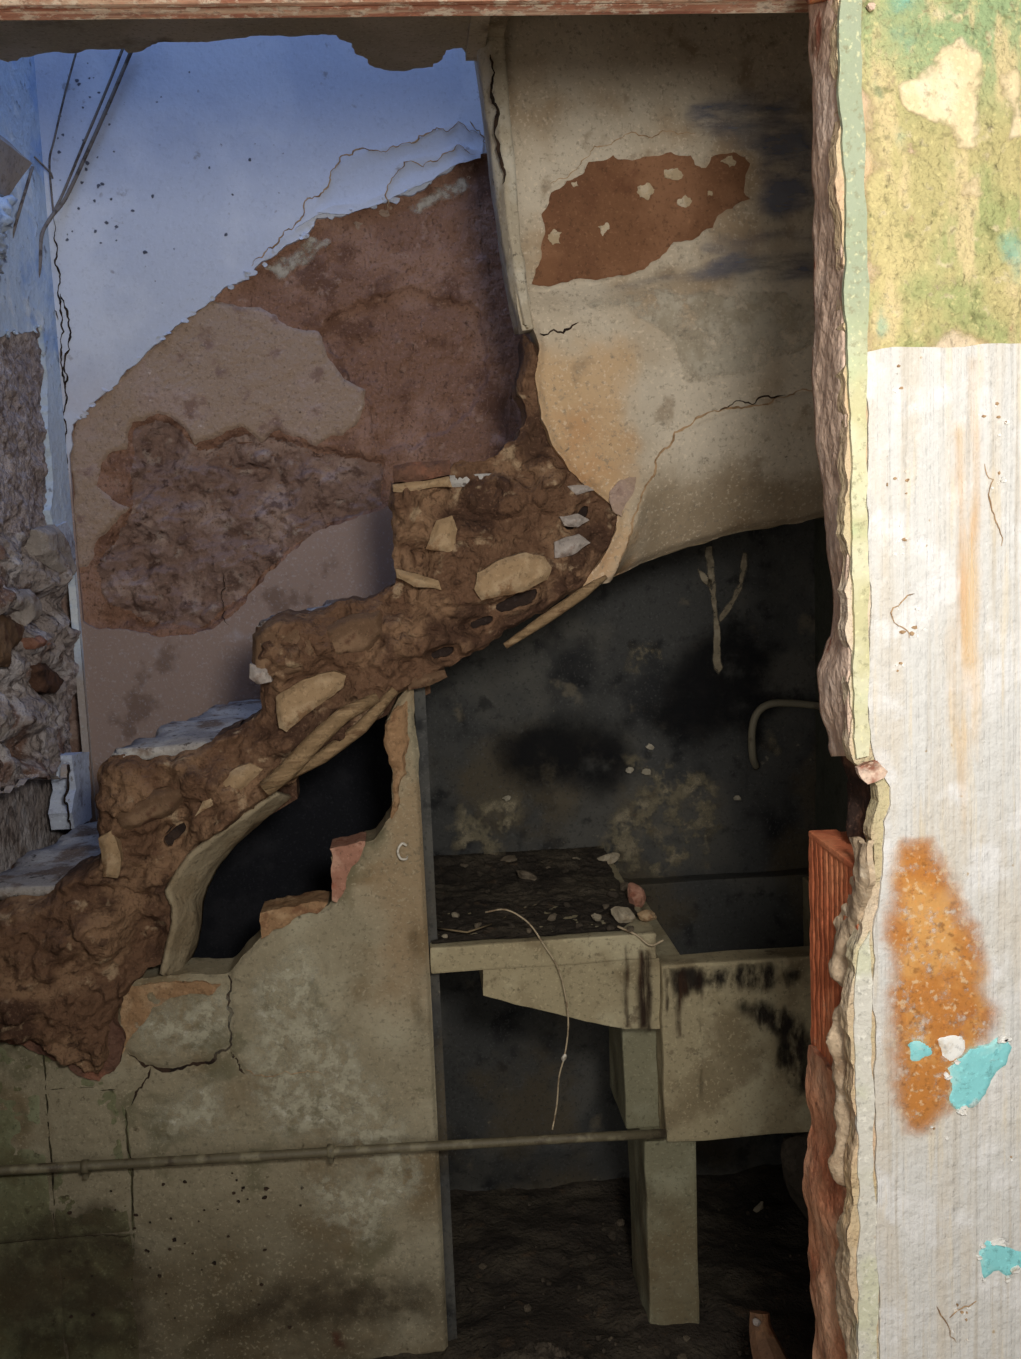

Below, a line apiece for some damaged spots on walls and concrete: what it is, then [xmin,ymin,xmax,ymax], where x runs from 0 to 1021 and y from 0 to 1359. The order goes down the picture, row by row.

crack [252,54,506,266]
flaking render [527,147,756,292]
peeling [861,0,1021,351]
flaking render [0,121,537,791]
crack [616,389,812,572]
flaking render [383,701,410,819]
spalling [164,823,186,845]
flaking render [259,832,367,939]
flaking render [120,980,221,1054]
crack [128,975,325,1105]
peeling [908,1035,1012,1115]
peeling [976,1238,1021,1283]